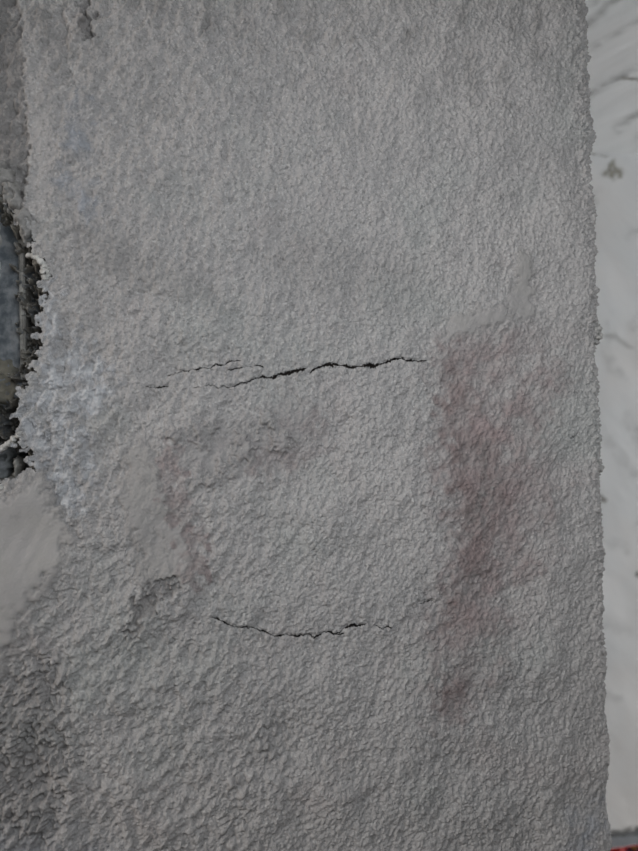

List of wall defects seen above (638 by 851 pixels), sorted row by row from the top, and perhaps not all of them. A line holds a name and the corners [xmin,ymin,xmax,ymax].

spalling [0,194,52,472]
crack [146,357,426,389]
crack [214,617,391,639]